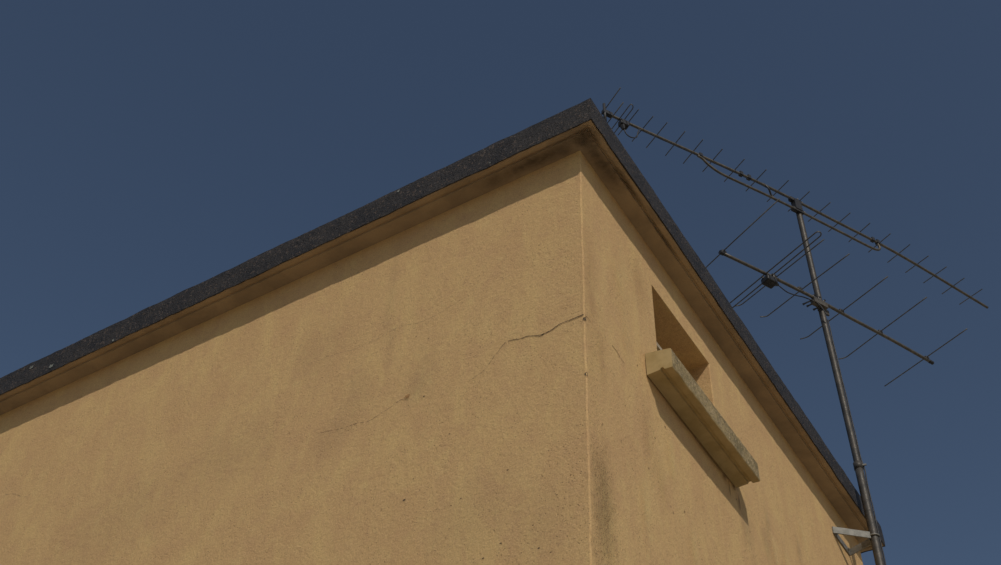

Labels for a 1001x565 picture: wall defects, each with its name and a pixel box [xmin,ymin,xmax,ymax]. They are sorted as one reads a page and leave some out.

crack [509,314,591,341]